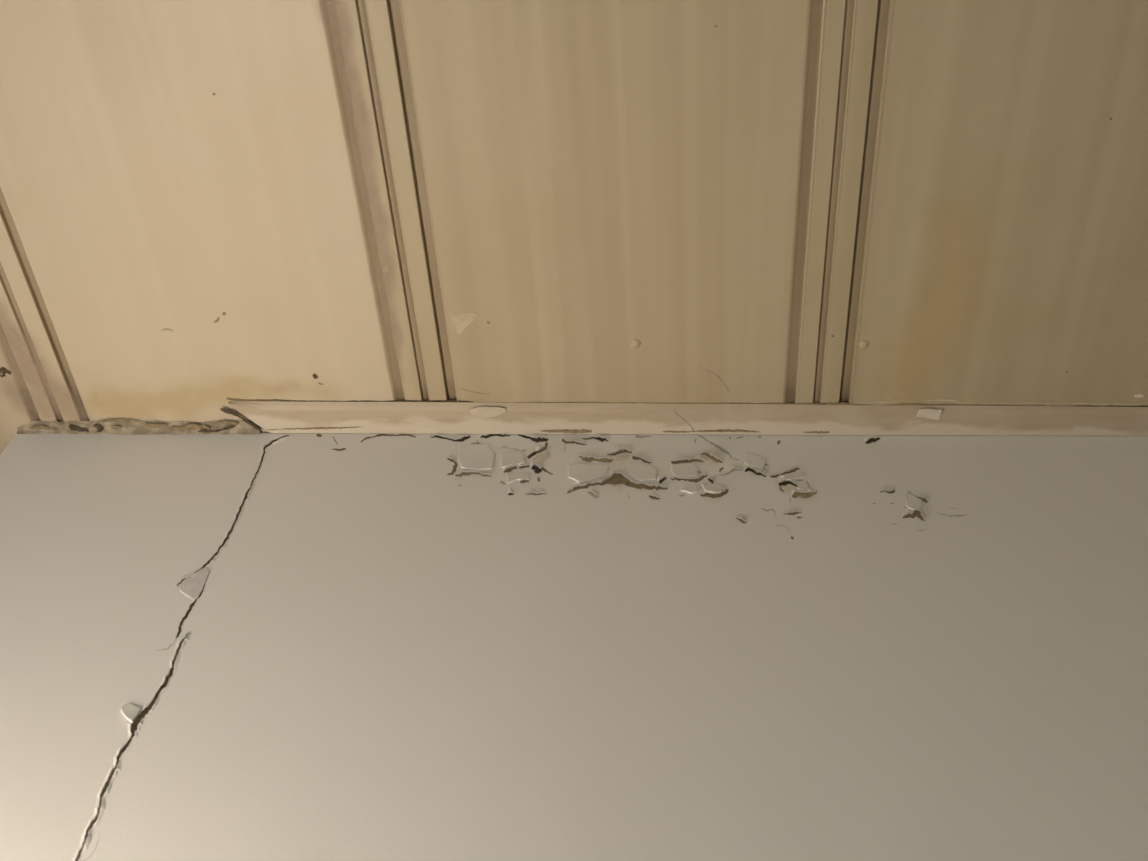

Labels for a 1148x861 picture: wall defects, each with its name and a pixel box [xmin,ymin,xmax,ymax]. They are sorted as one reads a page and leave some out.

crack [516,399,1148,434]
peeling [430,433,552,495]
peeling [562,434,817,518]
peeling [902,494,928,521]
crack [16,398,471,861]